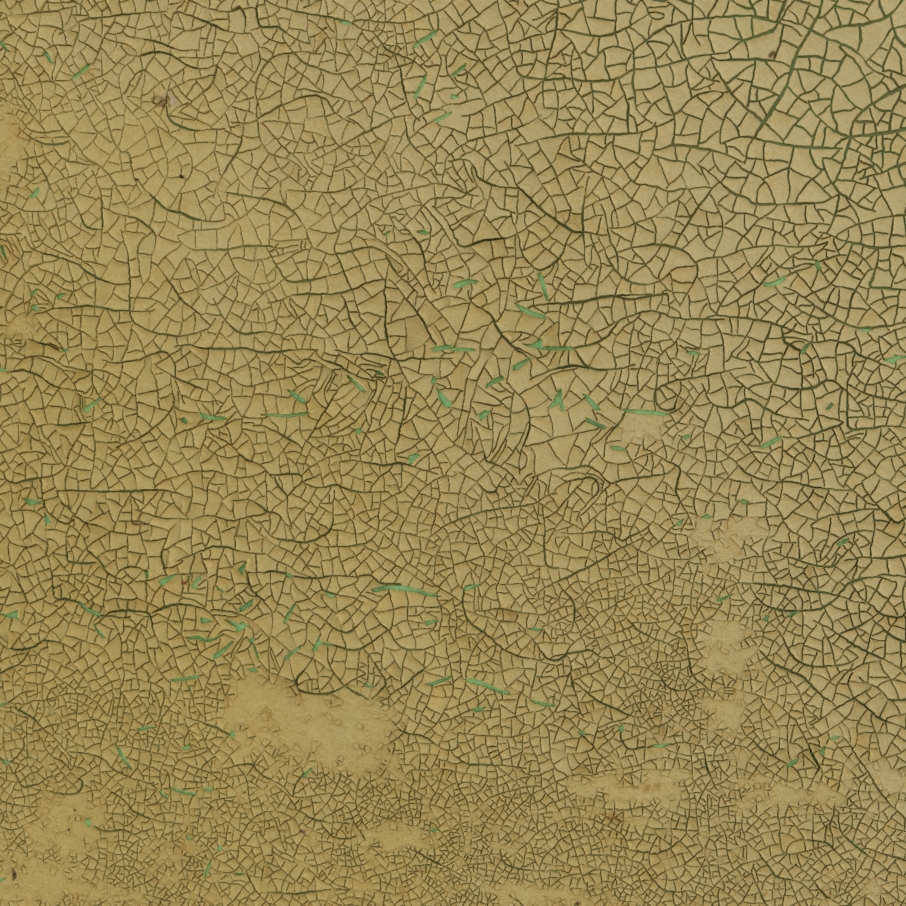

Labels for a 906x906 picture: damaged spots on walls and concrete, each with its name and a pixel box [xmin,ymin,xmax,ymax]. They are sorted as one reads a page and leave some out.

crack [490,352,512,381]
peeling [410,255,671,464]
peeling [364,576,453,601]
peeling [79,602,119,647]
peeling [134,550,345,686]
peeling [416,664,453,696]
peeling [465,668,559,713]
crack [368,841,388,859]
crack [57,891,108,906]
crack [334,871,352,906]